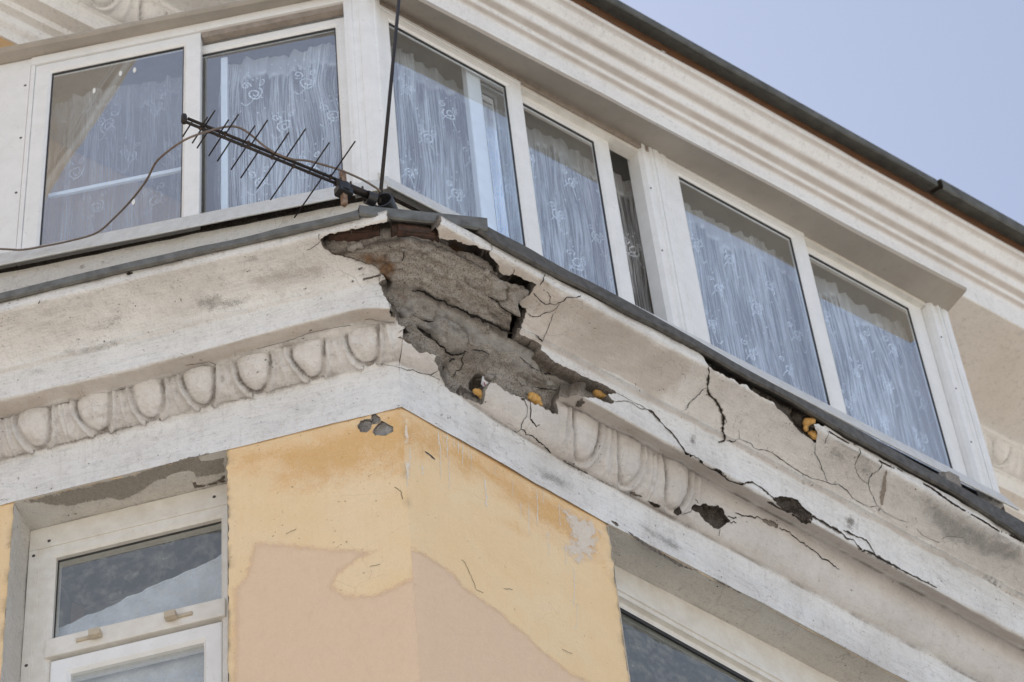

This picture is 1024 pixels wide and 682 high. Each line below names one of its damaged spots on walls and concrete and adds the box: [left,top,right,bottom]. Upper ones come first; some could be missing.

spalling [320,211,616,414]
crack [529,275,581,342]
peeling [24,453,226,516]
flaking render [357,414,409,486]
crack [514,399,551,453]
flaking render [673,503,730,529]
flaking render [761,496,813,528]
crack [616,367,962,568]
crack [810,515,937,588]